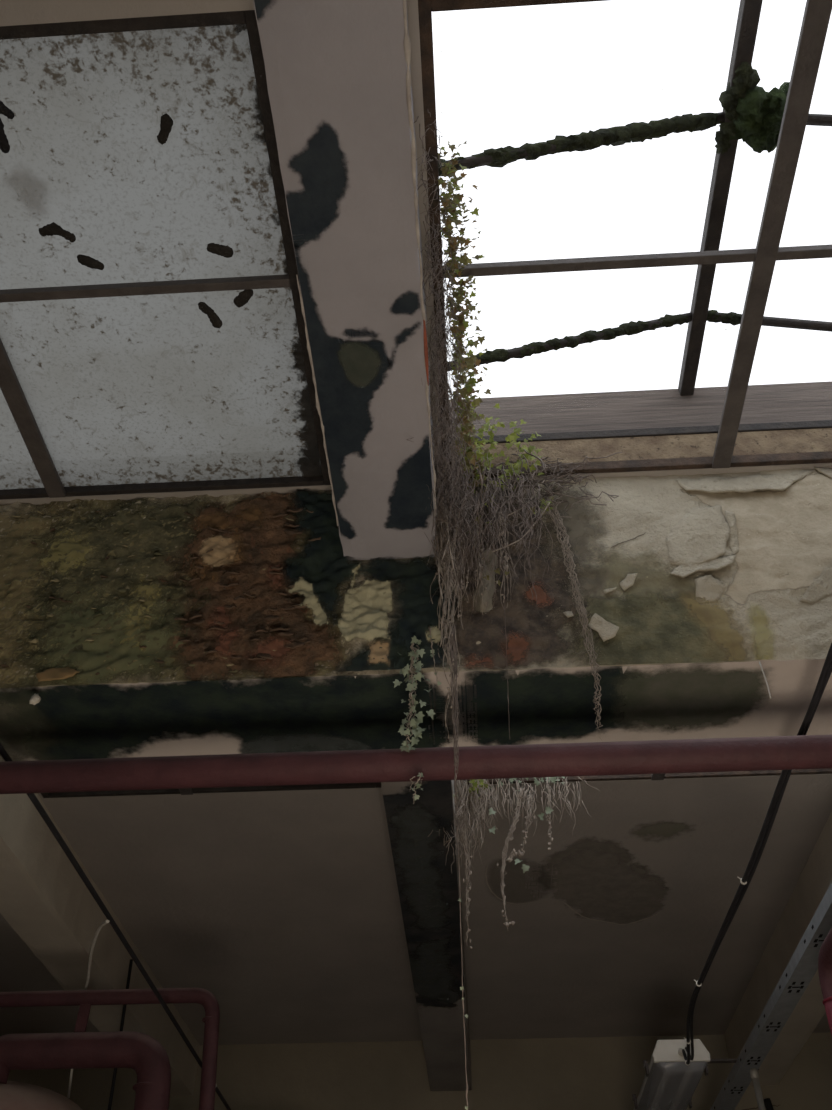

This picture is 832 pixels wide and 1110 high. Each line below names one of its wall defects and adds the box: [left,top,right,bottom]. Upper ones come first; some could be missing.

spalling [403,0,437,516]
spalling [296,275,338,526]
leakage [0,124,730,760]
spalling [151,492,392,680]
peeling [588,613,619,642]
peeling [604,573,638,594]
leakage [485,840,668,925]